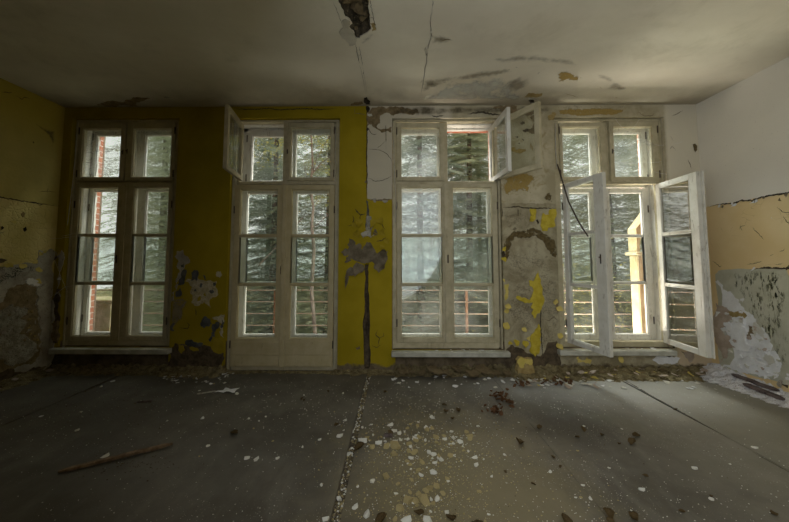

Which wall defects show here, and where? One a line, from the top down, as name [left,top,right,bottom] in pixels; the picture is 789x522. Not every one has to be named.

crack [420,0,450,91]
peeling [493,105,535,144]
peeling [171,250,222,306]
peeling [341,216,389,288]
peeling [530,209,557,231]
spalling [0,249,72,381]
peeling [168,315,225,367]
peeling [713,267,789,388]